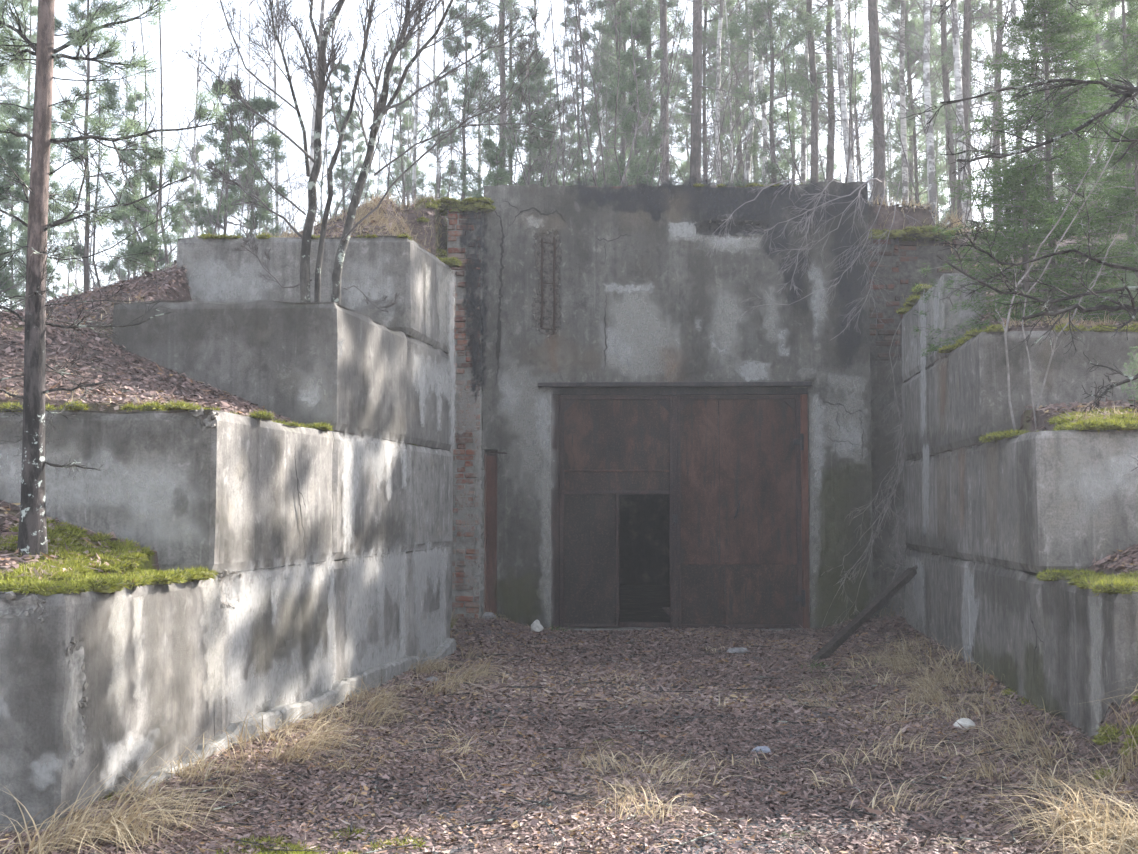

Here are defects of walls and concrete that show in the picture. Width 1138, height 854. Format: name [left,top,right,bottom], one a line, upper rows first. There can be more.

spalling [528,220,565,338]
crack [492,201,633,385]
leakage [574,176,874,368]
leakage [207,547,445,712]